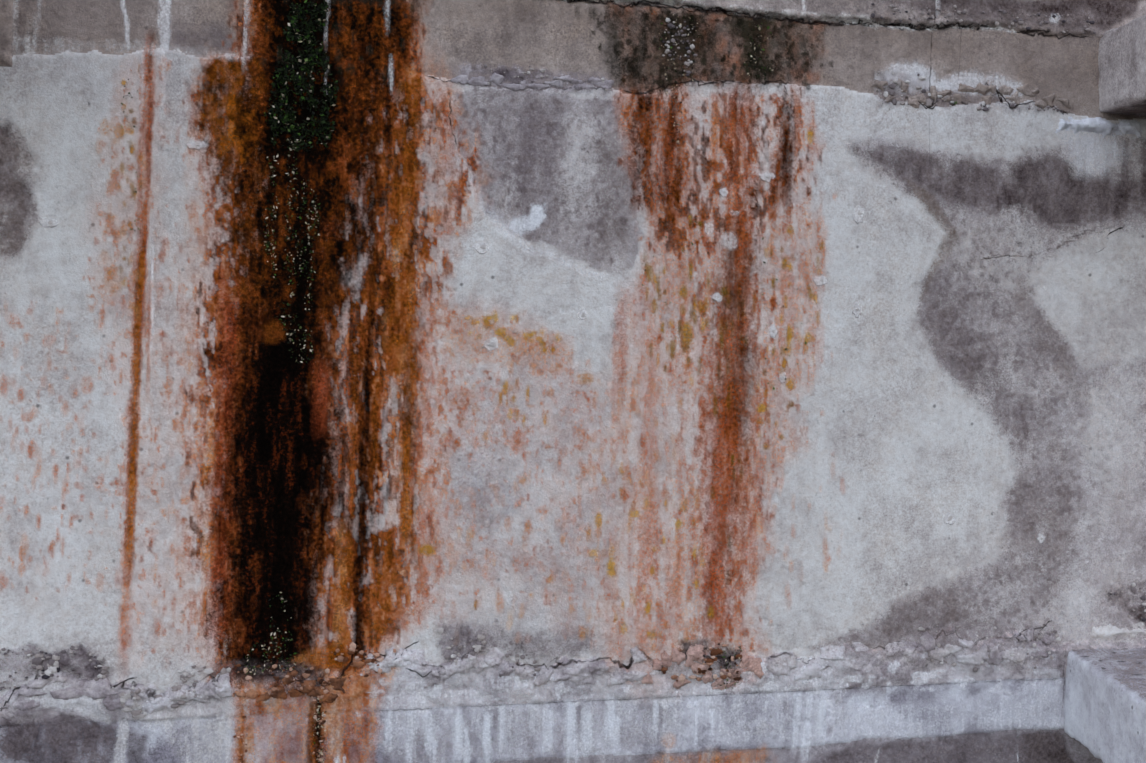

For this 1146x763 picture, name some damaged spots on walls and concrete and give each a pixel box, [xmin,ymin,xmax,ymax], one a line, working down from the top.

leakage [0,122,38,257]
rust [89,45,182,644]
rust [161,0,591,763]
spalling [0,625,1062,762]
leakage [450,75,640,272]
rust [576,45,825,658]
leakage [384,135,1146,763]
spalling [871,71,1071,112]